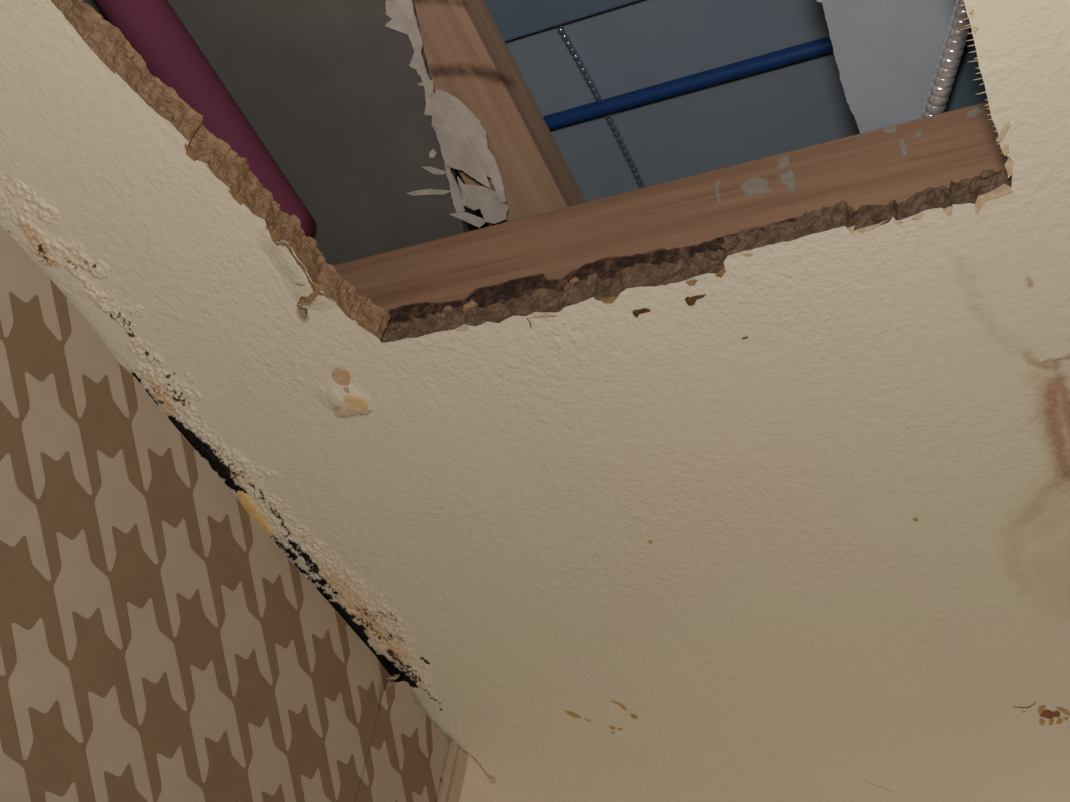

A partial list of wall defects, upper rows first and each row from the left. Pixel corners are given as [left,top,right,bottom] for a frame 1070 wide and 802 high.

spalling [51,0,1012,343]